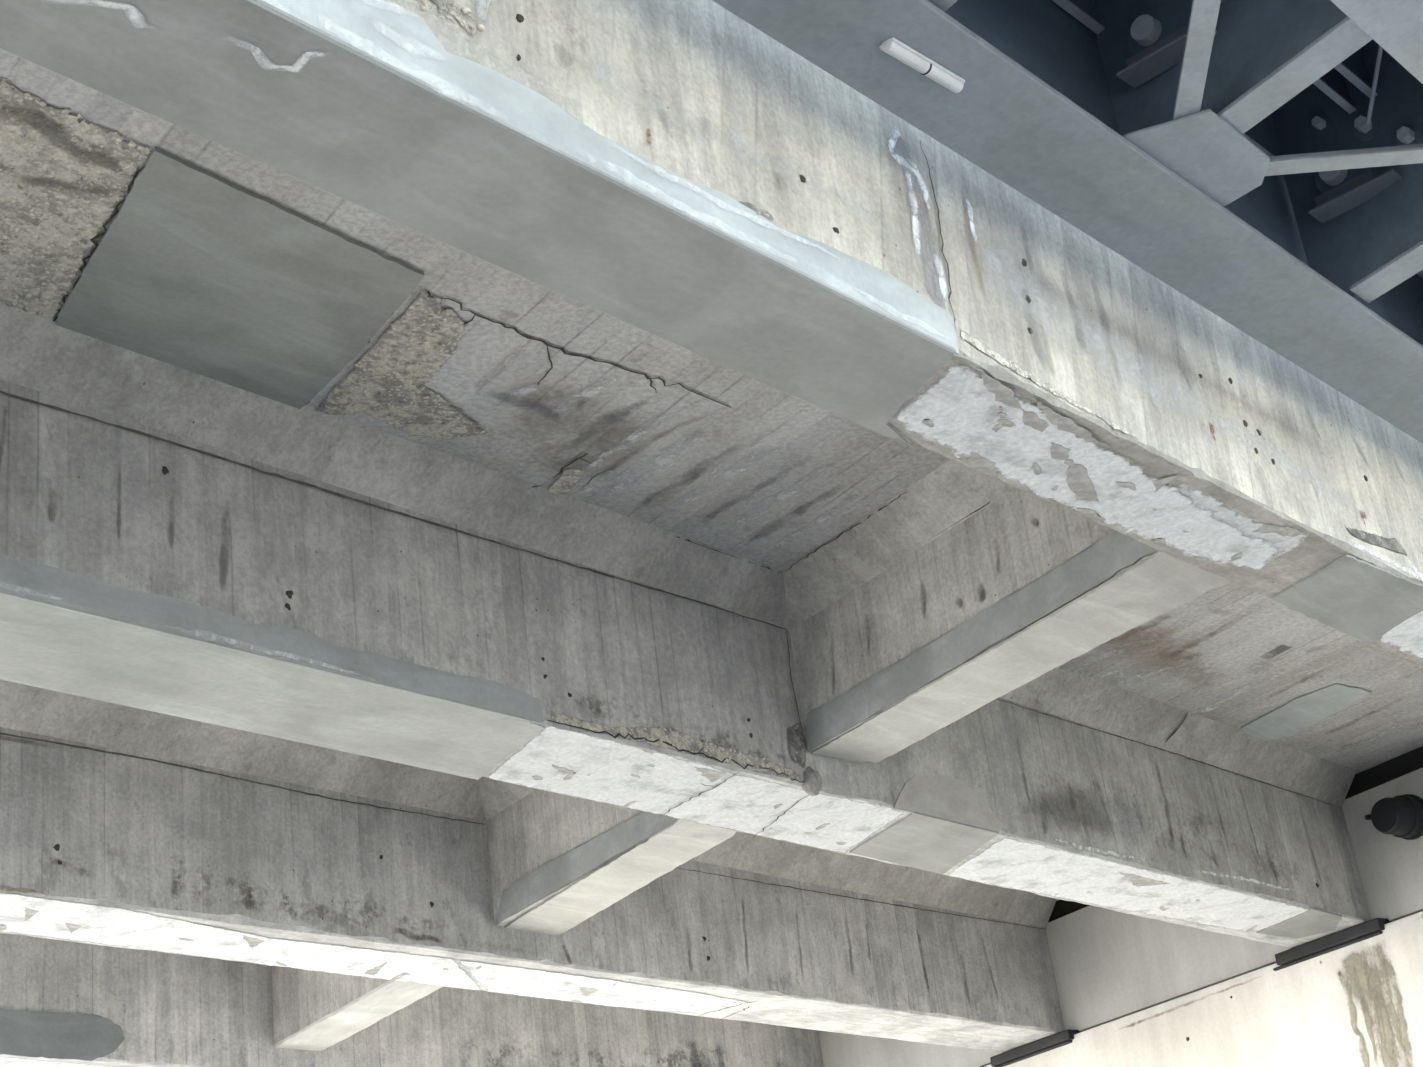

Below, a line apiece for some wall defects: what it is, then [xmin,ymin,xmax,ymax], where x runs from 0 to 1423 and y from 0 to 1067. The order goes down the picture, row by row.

spalling [0,77,150,319]
crack [53,166,144,321]
crack [920,140,955,322]
spalling [314,289,486,439]
crack [392,291,731,408]
peeling [897,330,1307,569]
peeling [1381,611,1423,658]
peeling [489,711,904,853]
peeling [0,1057,117,1067]
water stain [1339,946,1411,1067]